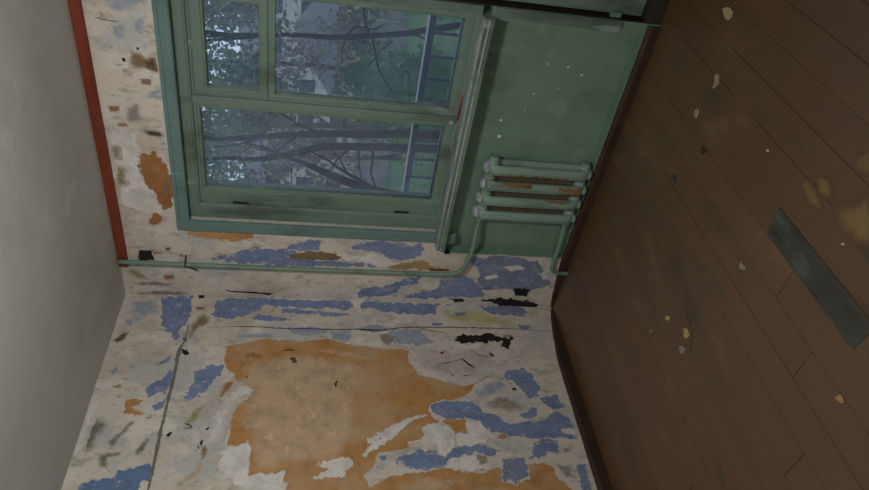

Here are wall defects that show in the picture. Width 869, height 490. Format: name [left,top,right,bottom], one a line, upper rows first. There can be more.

peeling [136,150,175,226]
peeling [176,227,255,242]
spalling [138,250,163,261]
spalling [289,251,341,261]
spalling [382,259,451,272]
peeling [483,265,525,280]
spalling [481,288,538,307]
crack [229,326,553,334]
crack [437,352,494,376]
peeling [123,398,166,416]
crack [147,323,189,490]
peeling [222,307,574,490]